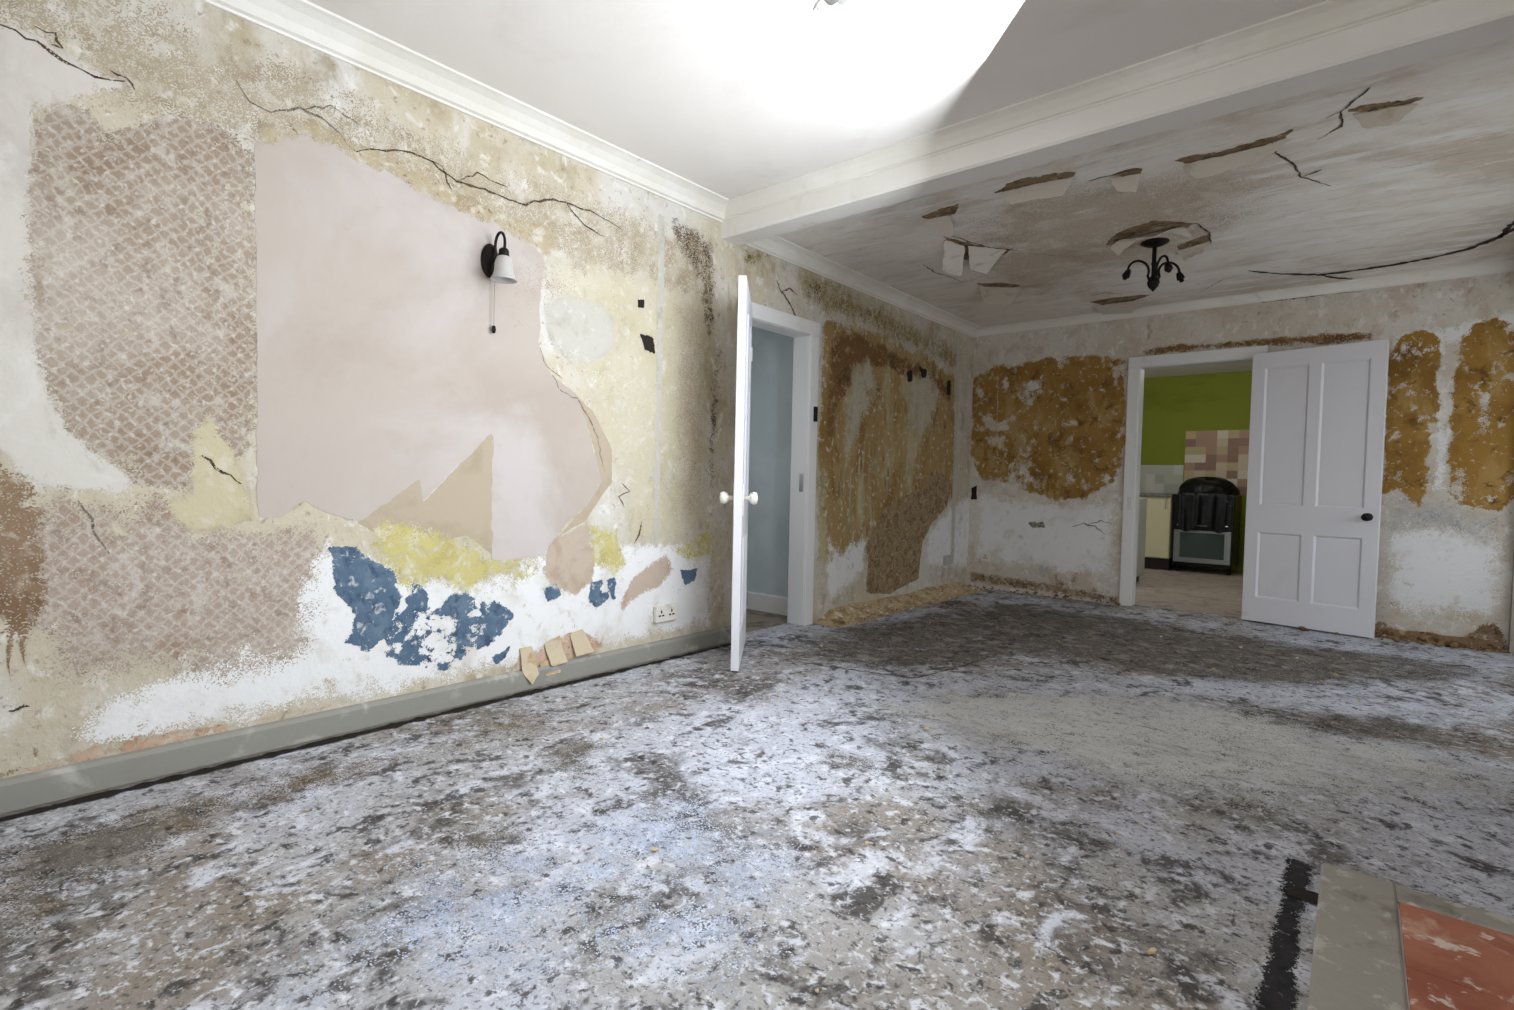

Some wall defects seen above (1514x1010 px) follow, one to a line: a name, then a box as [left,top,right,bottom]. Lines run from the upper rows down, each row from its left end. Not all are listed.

crack [0,24,135,90]
peeling [1317,88,1423,140]
crack [236,80,621,236]
peeling [994,168,1142,204]
peeling [1175,129,1330,186]
peeling [1106,220,1212,261]
crack [1206,221,1514,303]
peeling [1090,292,1149,315]
spalling [640,334,655,354]
spalling [907,366,927,382]
flaking render [1392,310,1514,492]
flaking render [17,523,712,772]